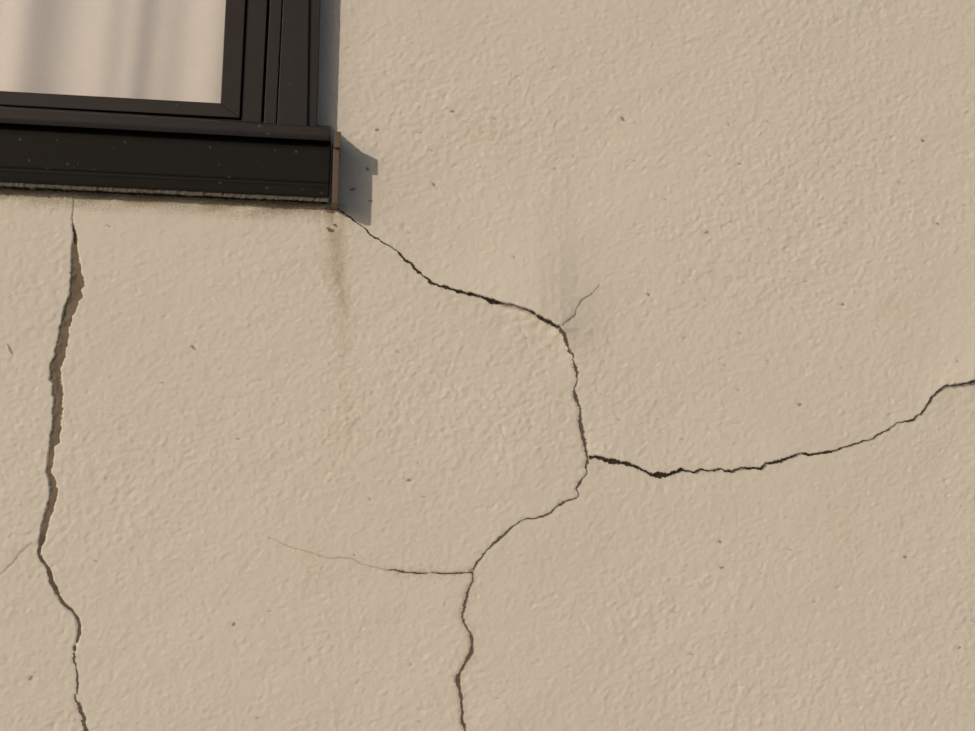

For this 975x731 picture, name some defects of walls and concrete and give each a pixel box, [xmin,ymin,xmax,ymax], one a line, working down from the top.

crack [0,195,88,731]
crack [268,208,975,731]